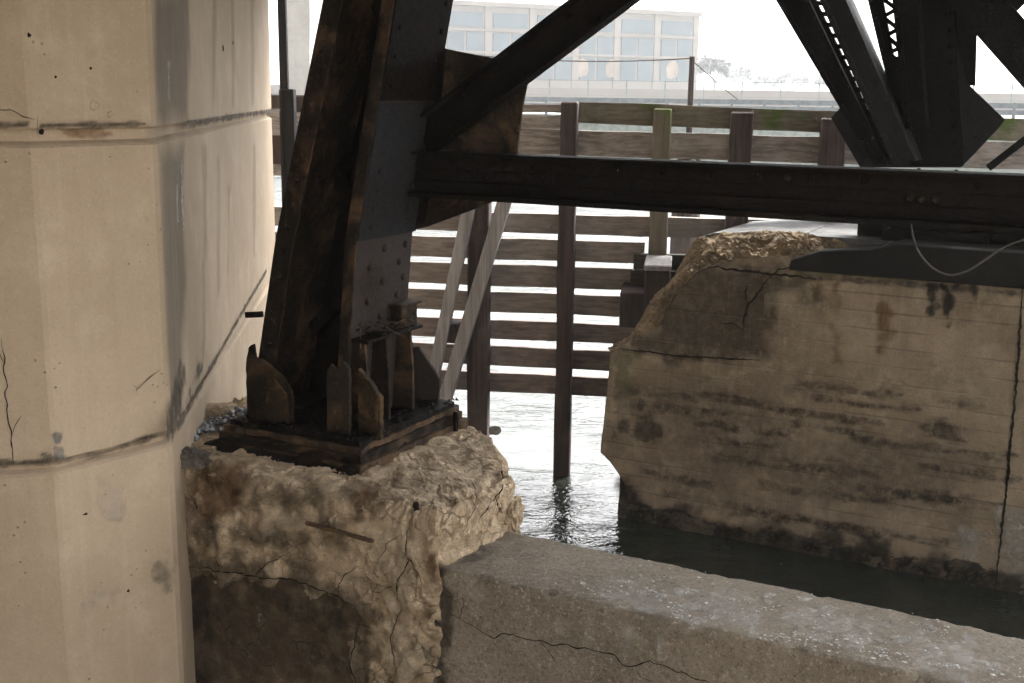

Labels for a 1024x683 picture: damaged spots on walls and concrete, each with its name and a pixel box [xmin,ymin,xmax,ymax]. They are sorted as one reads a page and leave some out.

crack [0,338,20,459]
crack [614,348,753,360]
spalling [608,230,859,353]
crack [714,266,816,331]
water stain [843,278,977,327]
crack [996,289,1023,572]
crack [462,459,504,556]
water stain [615,477,1024,595]
crack [190,508,421,683]
crack [453,598,710,683]